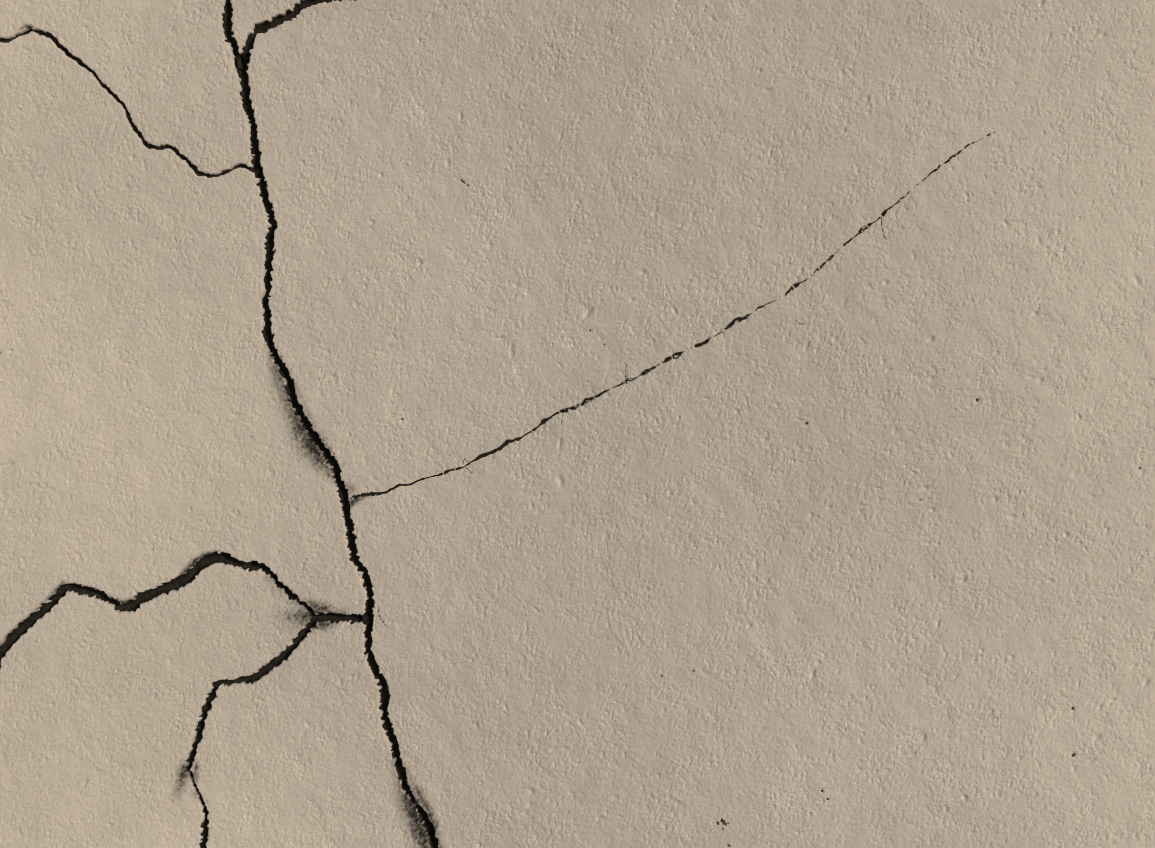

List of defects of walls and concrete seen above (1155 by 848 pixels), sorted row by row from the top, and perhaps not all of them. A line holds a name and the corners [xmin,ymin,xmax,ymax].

crack [0,0,776,848]
crack [785,132,995,296]